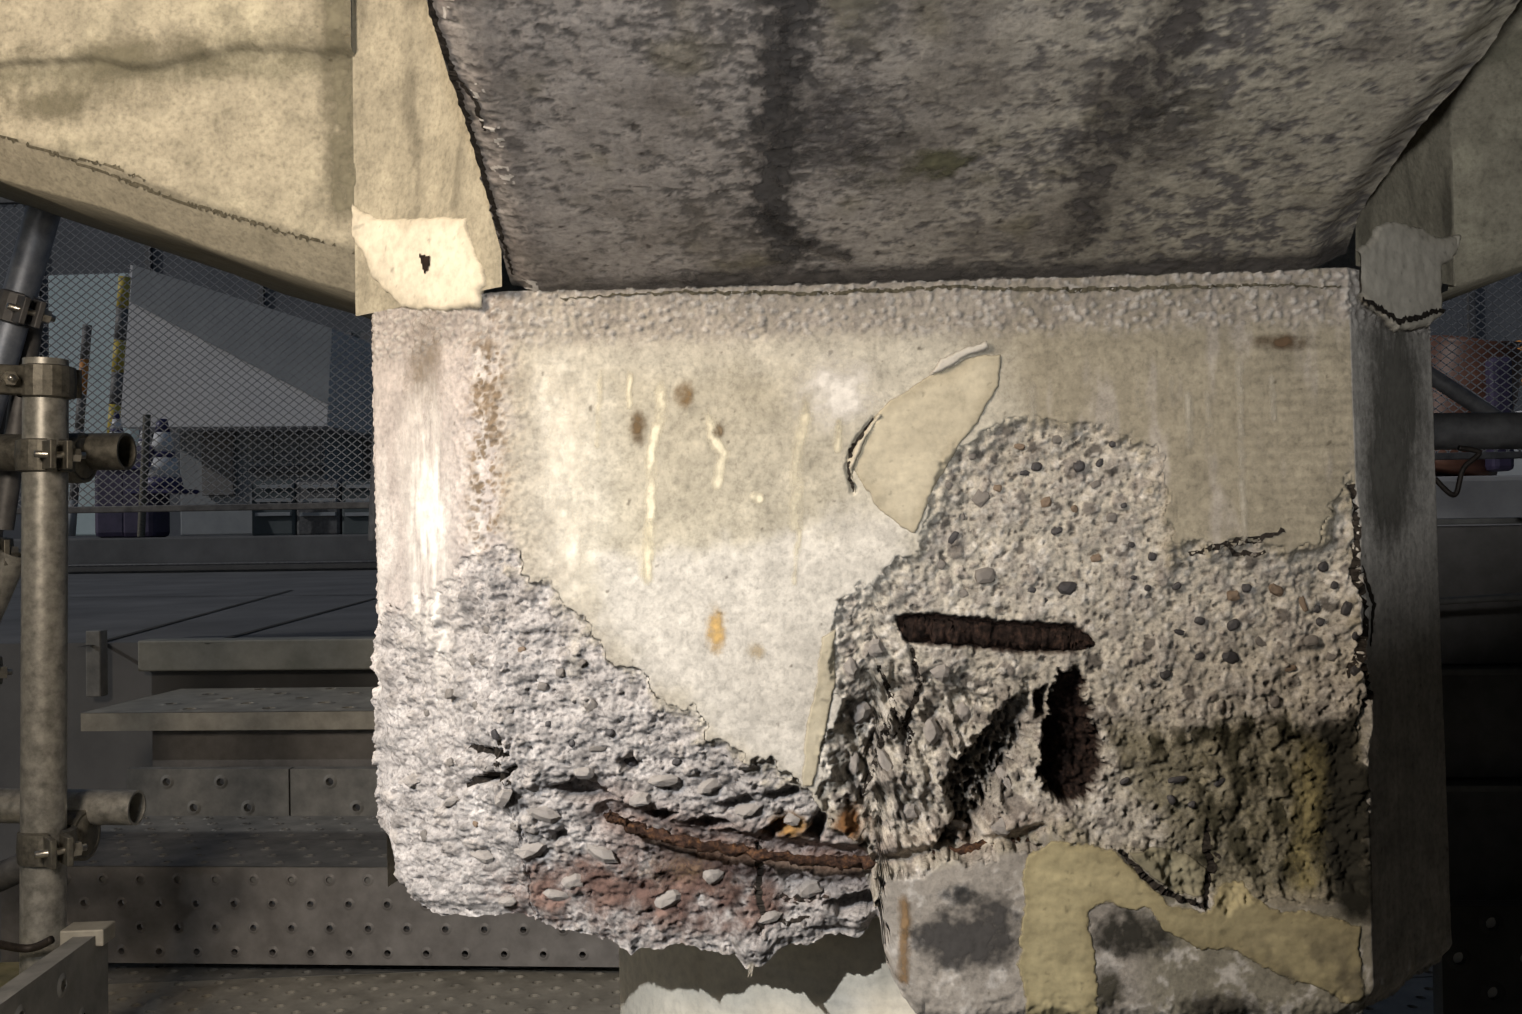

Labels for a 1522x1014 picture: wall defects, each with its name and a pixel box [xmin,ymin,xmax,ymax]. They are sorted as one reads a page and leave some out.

damp [682,0,1349,289]
spalling [370,342,1373,976]
crack [1346,484,1376,727]
corrosion [512,840,779,927]
corrosion [775,815,809,836]
corrosion [835,804,860,838]